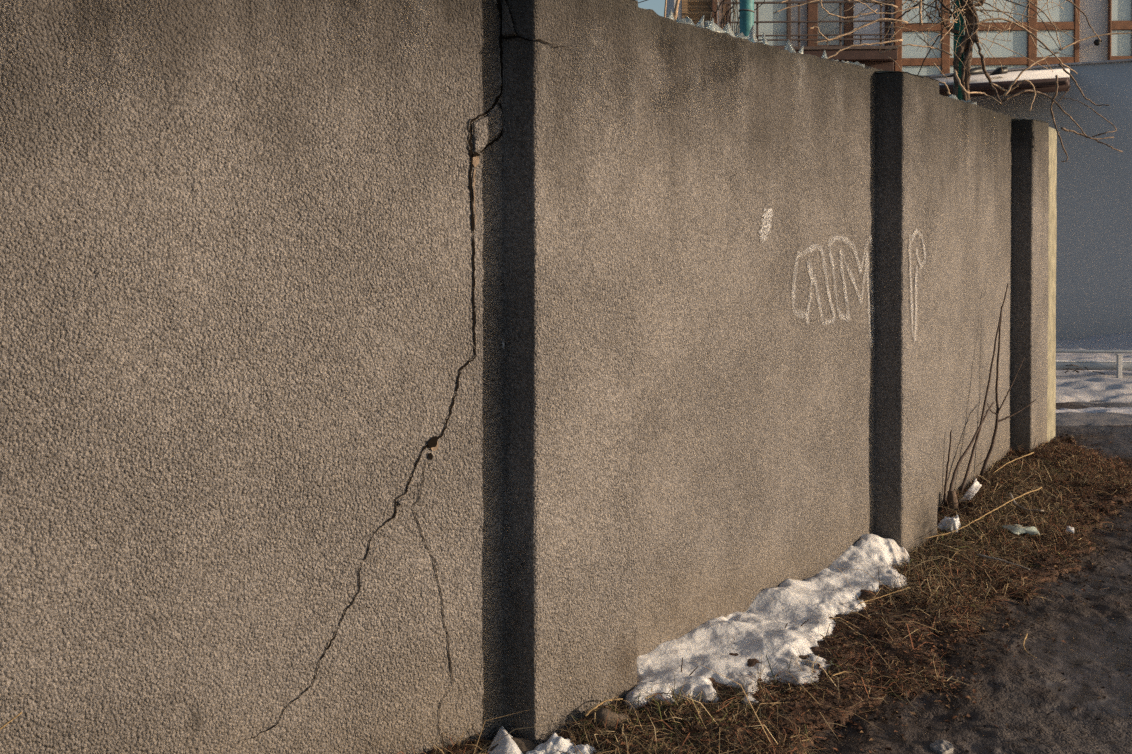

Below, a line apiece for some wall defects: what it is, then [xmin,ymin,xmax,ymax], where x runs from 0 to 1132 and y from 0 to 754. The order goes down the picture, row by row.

crack [229,0,564,751]